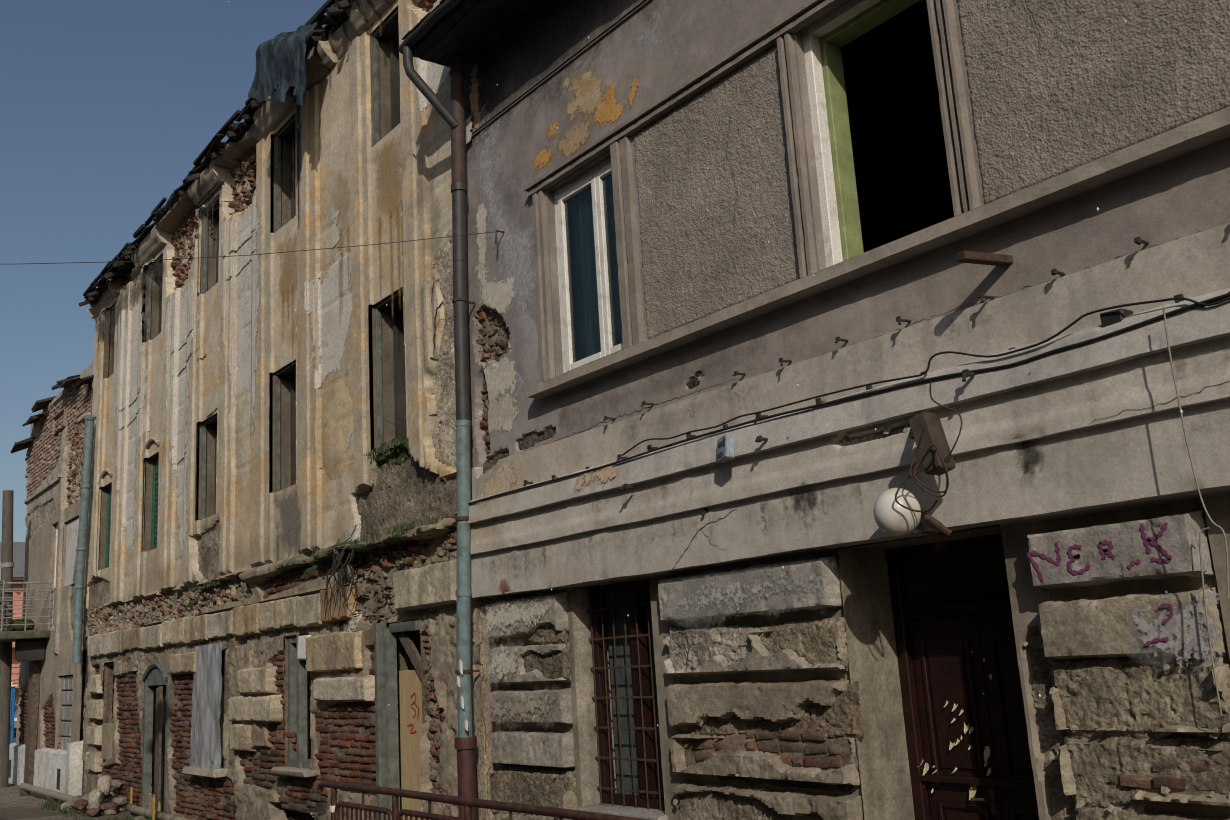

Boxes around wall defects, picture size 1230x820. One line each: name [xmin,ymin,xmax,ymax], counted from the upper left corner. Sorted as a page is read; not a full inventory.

damp [292,122,301,227]
damp [377,144,404,293]
spalling [25,383,92,541]
spalling [70,140,556,654]
crack [672,509,736,571]
damp [1018,442,1041,472]
spalling [94,673,152,810]
spalling [165,653,376,820]
spalling [422,636,445,793]
spalling [484,599,571,723]
spalling [668,568,864,820]
spalling [1023,587,1230,820]